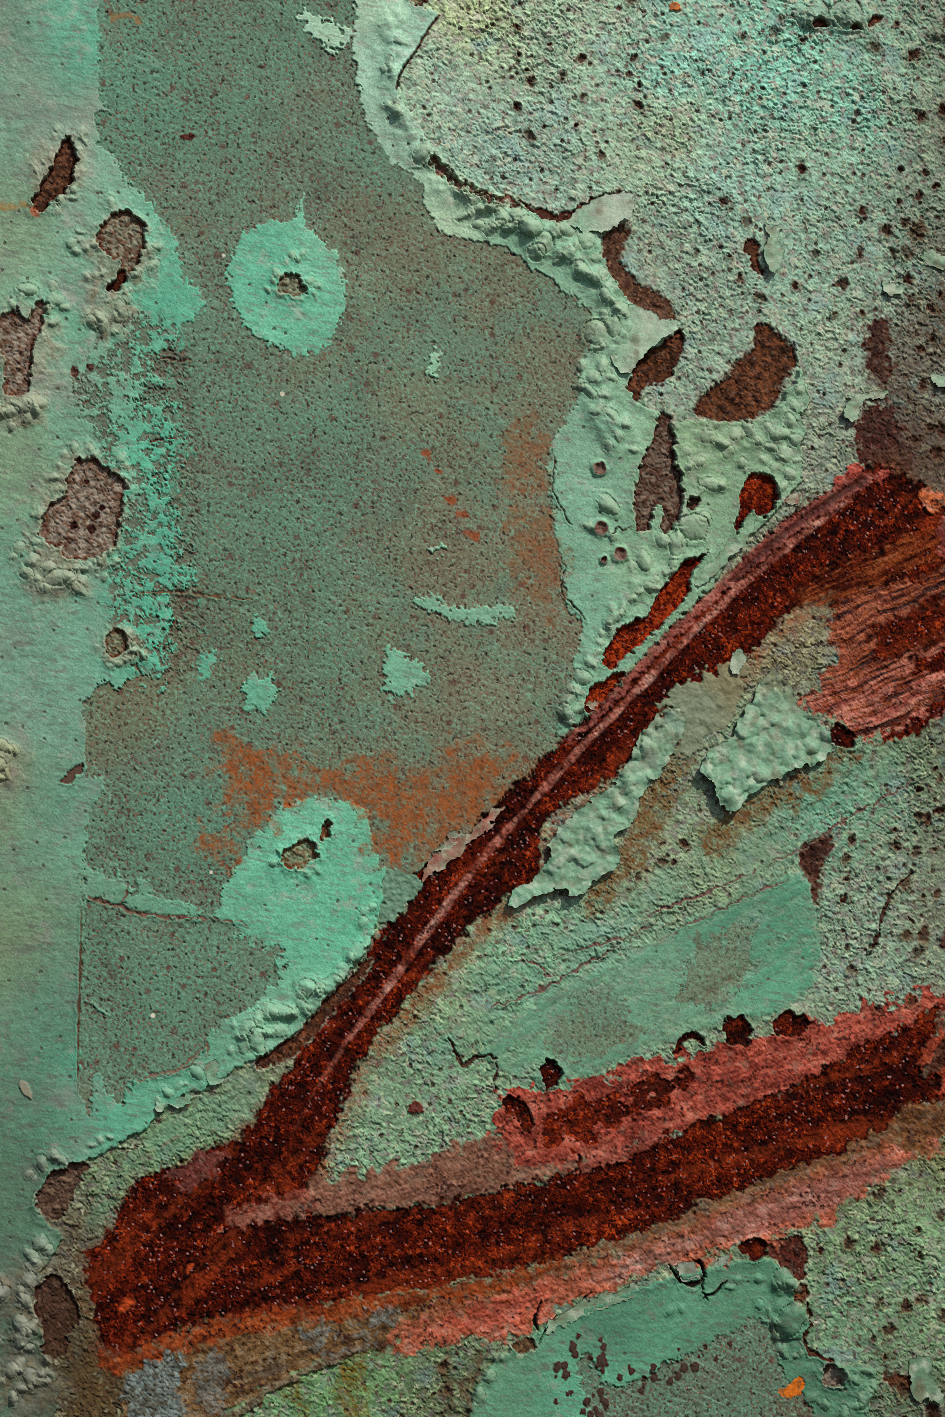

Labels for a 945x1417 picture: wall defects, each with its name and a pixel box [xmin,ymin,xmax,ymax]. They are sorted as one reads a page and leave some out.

corrosion [903,245,945,369]
peeling [71,0,834,1116]
corrosion [56,312,945,1417]
crack [447,1037,500,1097]
crack [667,1254,730,1302]